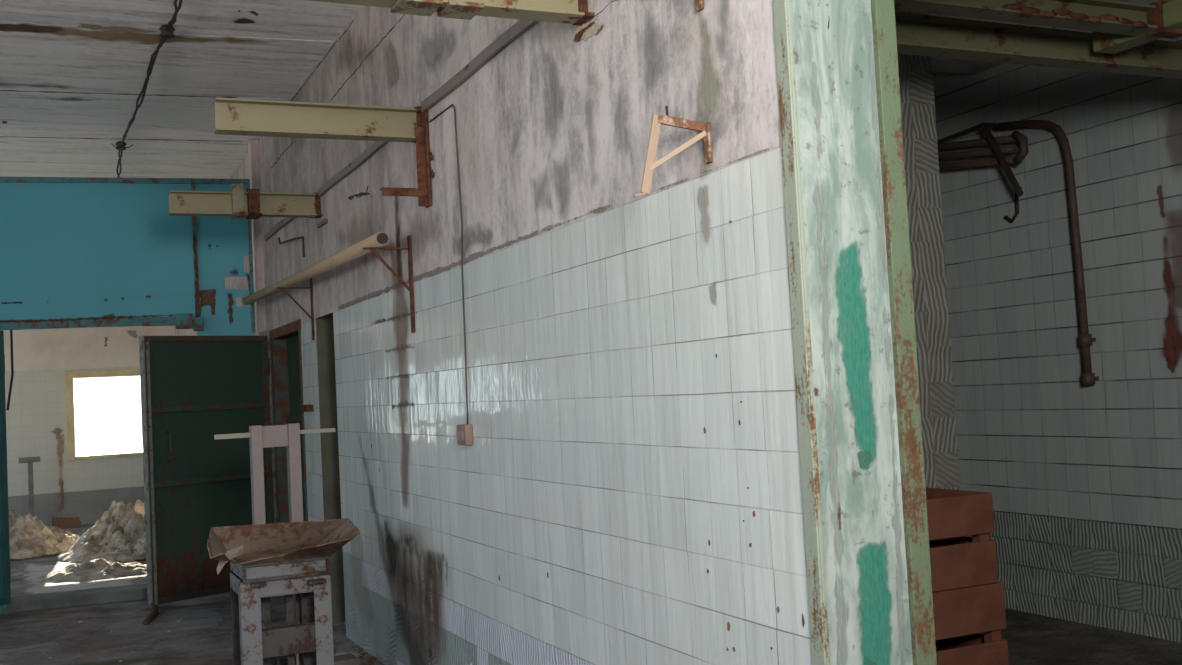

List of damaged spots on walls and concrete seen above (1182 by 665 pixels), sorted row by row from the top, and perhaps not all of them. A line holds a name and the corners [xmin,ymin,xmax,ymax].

leakage [0,24,254,44]
leakage [387,43,398,85]
leakage [548,63,562,135]
leakage [698,21,724,150]
peeling [812,64,822,159]
peeling [869,37,880,183]
leakage [698,186,709,241]
rust [0,299,173,323]
rust [193,232,234,324]
rust [1163,260,1182,372]
peeling [814,186,905,665]